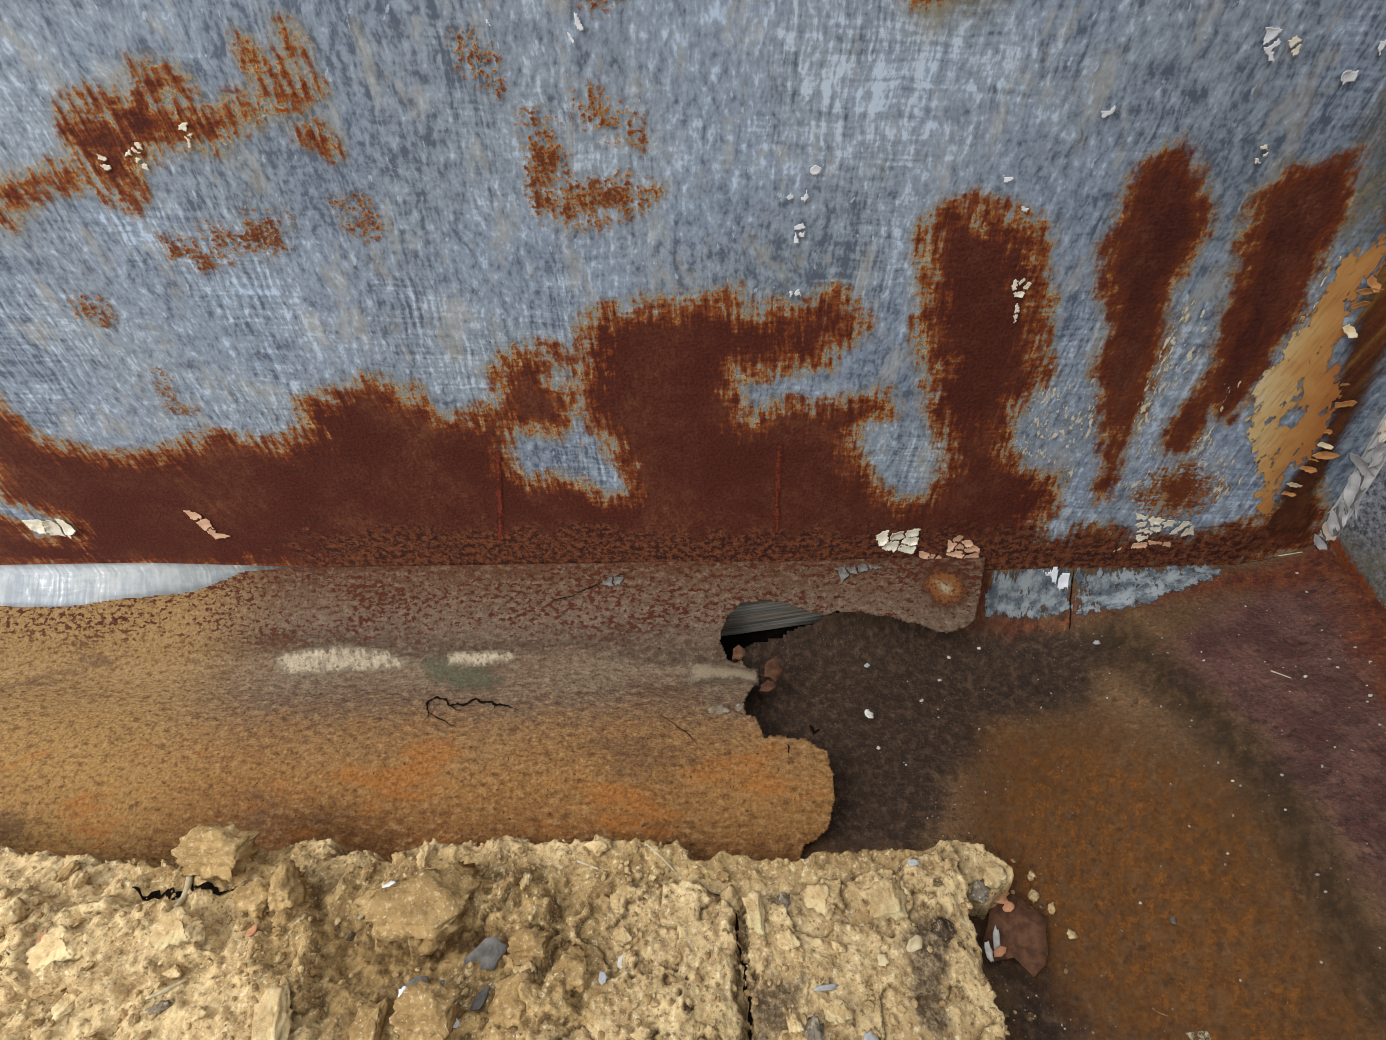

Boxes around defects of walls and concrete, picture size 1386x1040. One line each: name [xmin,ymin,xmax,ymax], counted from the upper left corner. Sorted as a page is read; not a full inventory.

rust [572,0,613,14]
rust [909,0,951,11]
rust [449,28,506,101]
peeling [1263,27,1302,62]
peeling [1341,70,1359,85]
rust [0,11,345,233]
rust [515,79,667,234]
rust [0,137,1386,610]
peeling [1192,233,1386,550]
peeling [837,528,980,583]
rust [982,736,1372,1040]